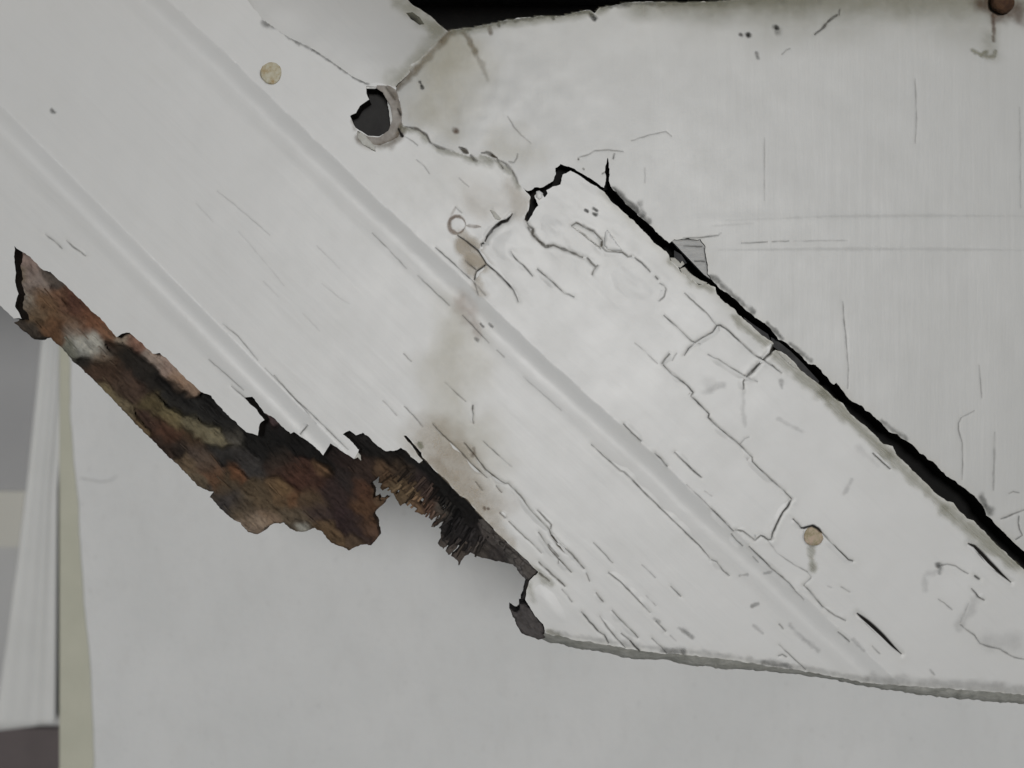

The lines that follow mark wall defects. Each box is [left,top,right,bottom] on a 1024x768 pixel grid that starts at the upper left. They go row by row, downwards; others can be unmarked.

crack [398,113,431,143]
peeling [670,257,707,285]
crack [458,159,853,651]
crack [873,451,892,469]
crack [432,406,584,585]
spalling [509,579,545,640]